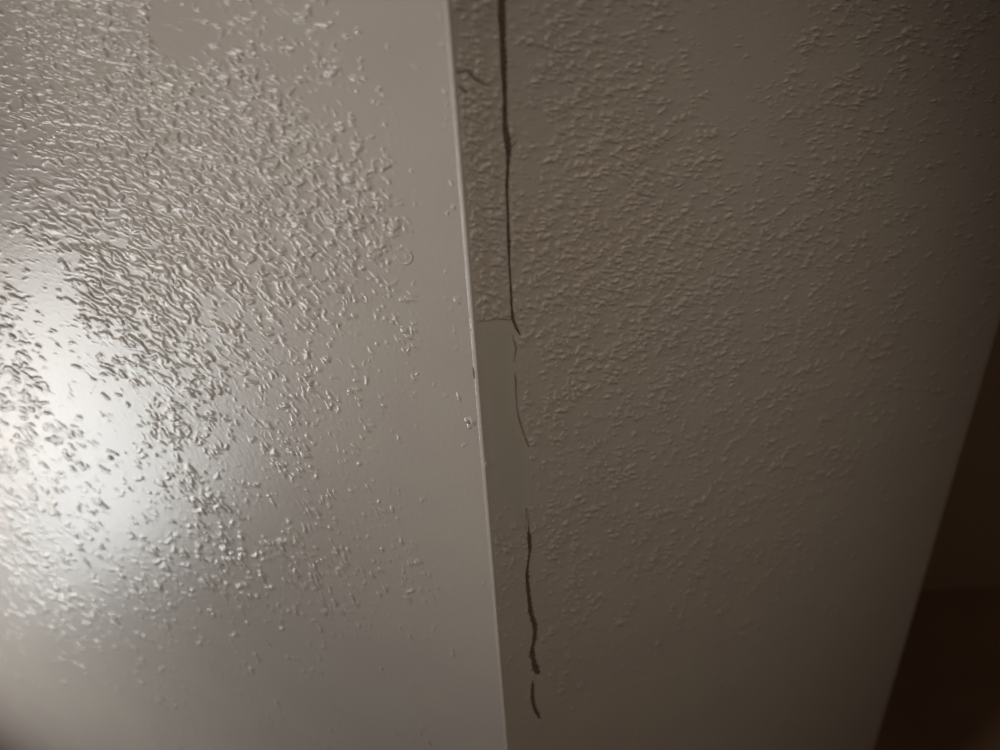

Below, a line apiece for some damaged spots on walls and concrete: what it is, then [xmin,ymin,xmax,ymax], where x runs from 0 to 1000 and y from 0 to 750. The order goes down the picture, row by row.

crack [525,508,541,719]